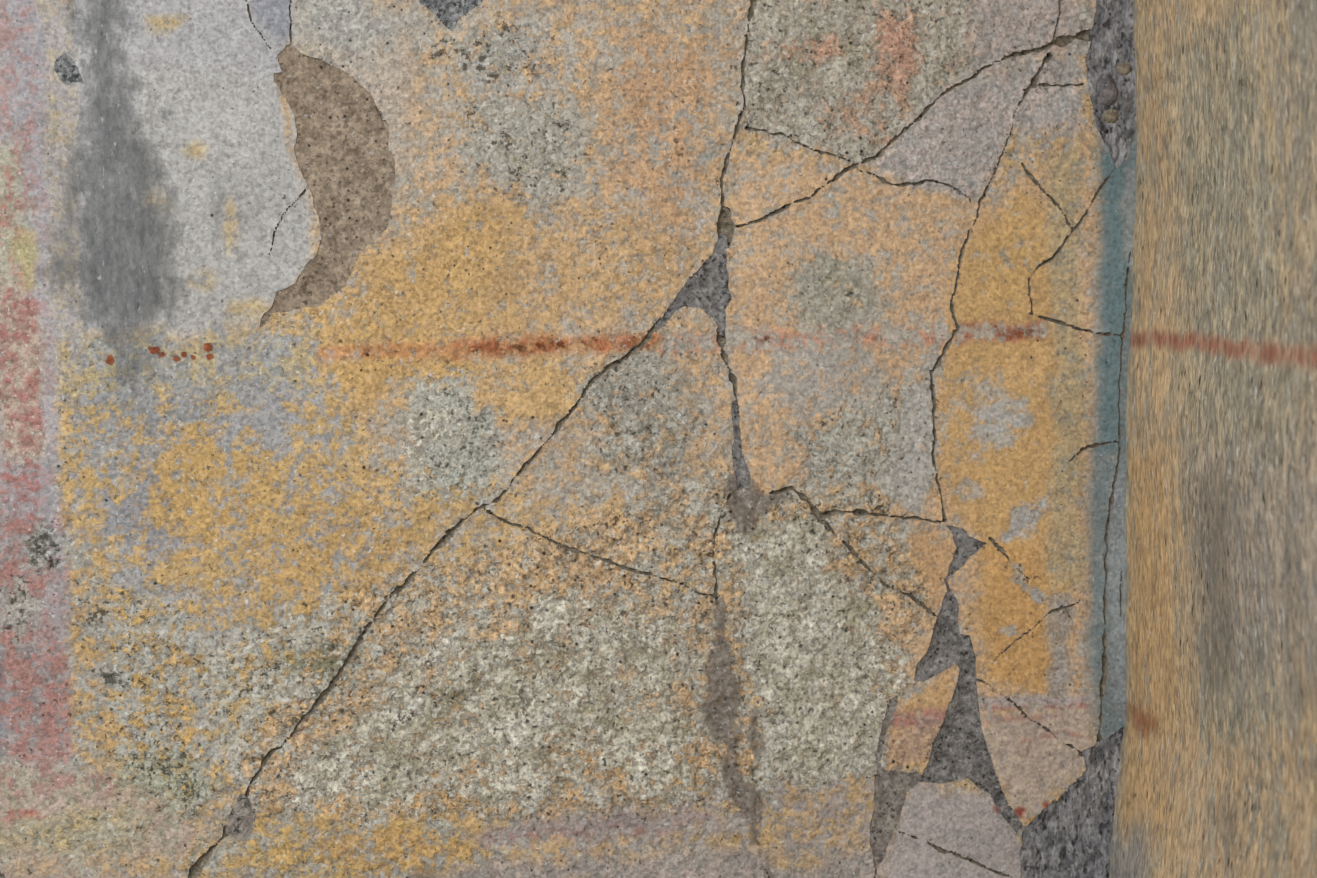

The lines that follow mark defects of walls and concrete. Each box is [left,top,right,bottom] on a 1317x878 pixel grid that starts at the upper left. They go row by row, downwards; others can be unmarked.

crack [246,0,292,49]
water stain [55,0,174,342]
flaking render [259,41,395,328]
crack [269,189,306,255]
rust [148,343,213,362]
crack [716,0,1130,756]
crack [243,319,731,797]
crack [188,825,228,878]
crack [899,831,1009,876]